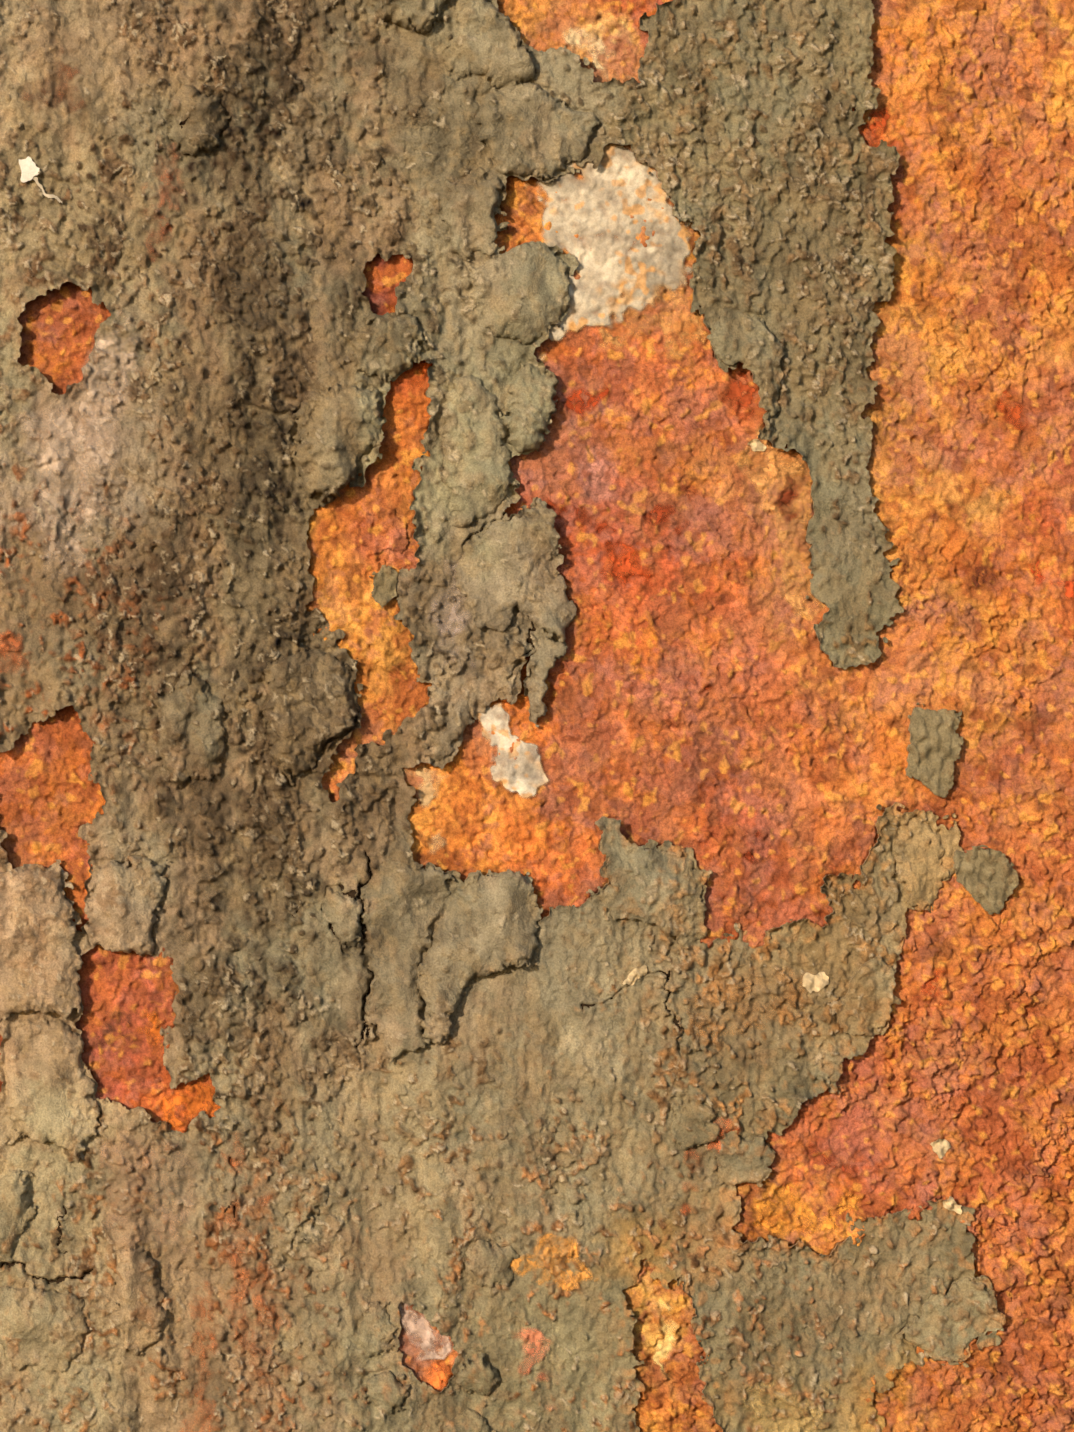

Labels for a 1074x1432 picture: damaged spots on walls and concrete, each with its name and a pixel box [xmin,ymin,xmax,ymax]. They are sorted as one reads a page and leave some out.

rust [852,108,890,137]
peeling [17,282,111,395]
rust [555,388,610,414]
rust [721,371,756,420]
rust [777,479,798,520]
rust [547,500,651,585]
peeling [305,360,432,802]
rust [971,559,996,588]
peeling [360,0,1074,1432]
rust [743,832,760,863]
peeling [0,705,218,1163]